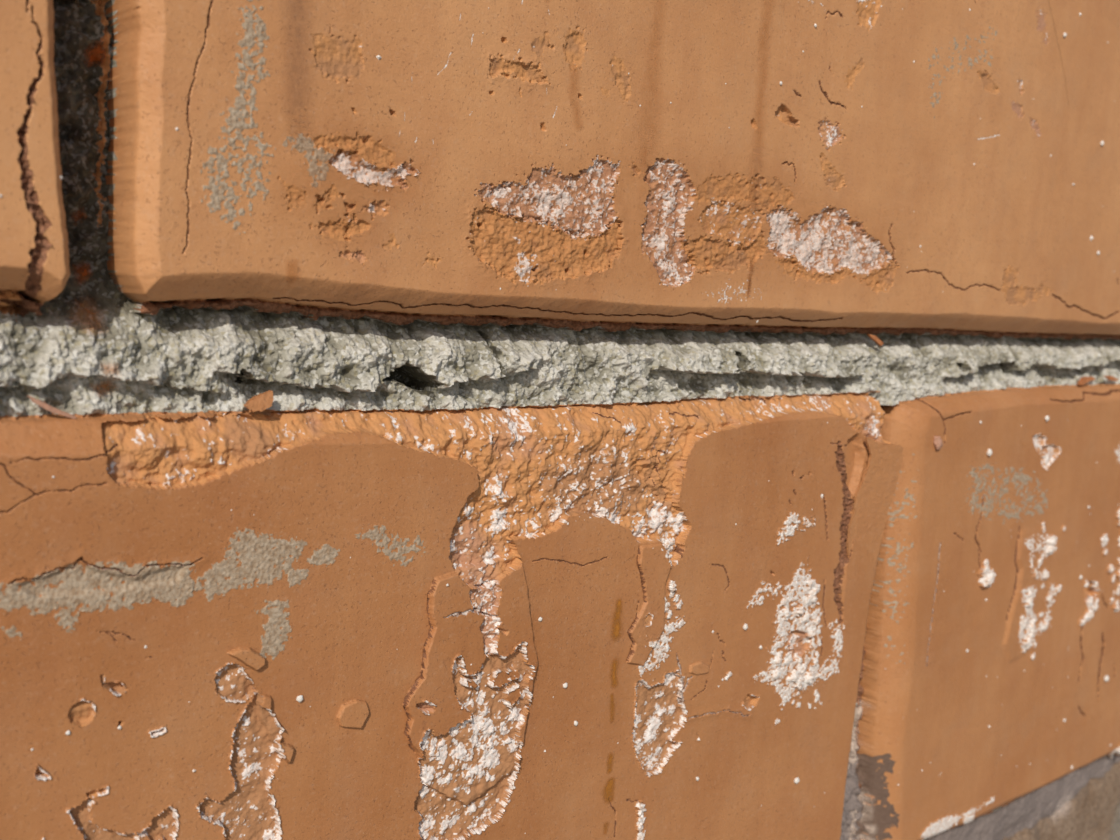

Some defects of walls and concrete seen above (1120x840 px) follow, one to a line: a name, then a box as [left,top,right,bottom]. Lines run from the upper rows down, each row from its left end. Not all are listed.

crack [0,0,52,317]
crack [183,0,213,254]
spalling [466,155,900,294]
crack [0,444,118,513]
crack [403,580,480,750]
spalling [100,390,904,840]
efflorescence [747,557,845,725]
crack [821,441,854,656]
efflorescence [1018,522,1066,660]
efflorescence [1079,508,1120,626]
spalling [35,766,52,781]
spalling [66,785,179,840]